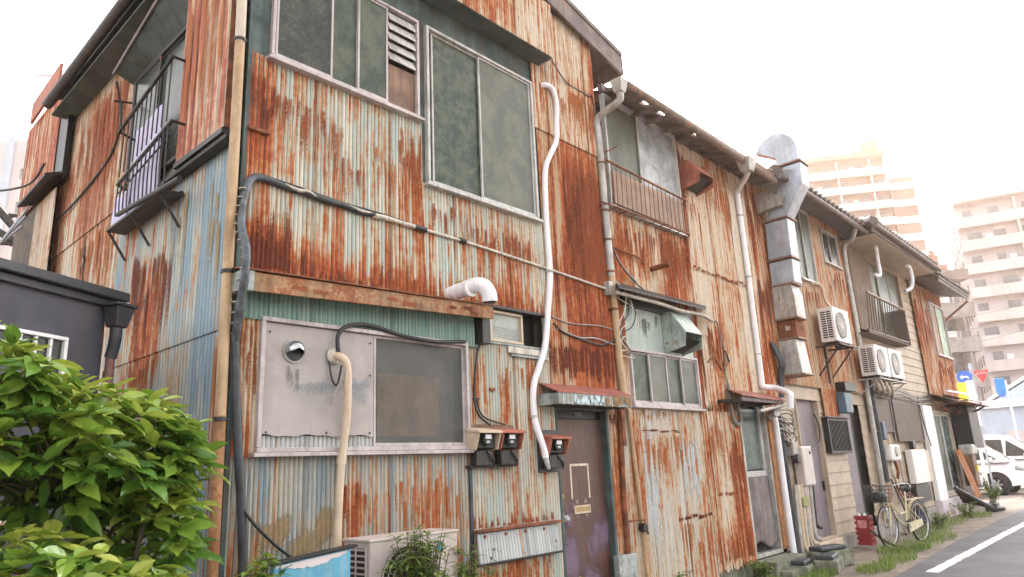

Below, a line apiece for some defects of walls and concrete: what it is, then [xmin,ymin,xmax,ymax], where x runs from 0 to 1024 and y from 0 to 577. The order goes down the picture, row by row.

rust [252,72,364,198]
rust [374,127,421,213]
rust [131,249,171,346]
rust [250,208,477,316]
rust [432,203,532,273]
rust [562,149,774,347]
rust [499,363,539,405]
rust [550,342,616,382]
rust [697,323,725,390]
rust [343,483,367,527]
rust [609,410,687,526]
rust [679,403,754,571]